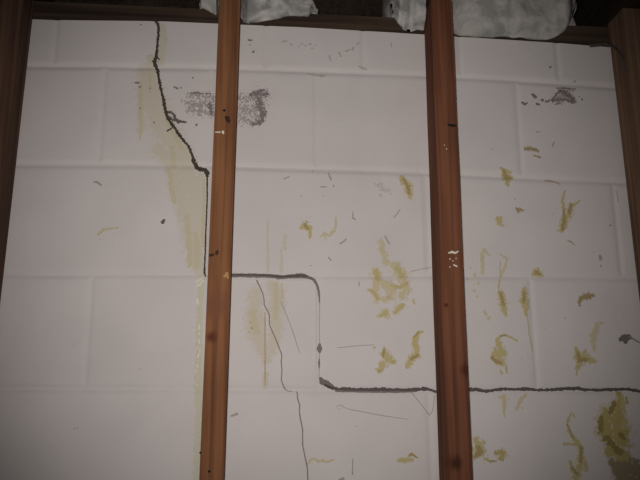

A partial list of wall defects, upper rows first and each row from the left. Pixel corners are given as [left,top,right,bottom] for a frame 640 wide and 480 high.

crack [152,20,210,277]
damp [557,190,581,234]
damp [129,23,210,480]
damp [366,238,415,321]
crack [232,273,371,480]
crack [332,387,436,420]
damp [372,330,424,376]
damp [489,333,518,375]
crack [469,385,640,393]
damp [562,411,589,480]
damp [571,321,603,376]
damp [591,391,640,480]